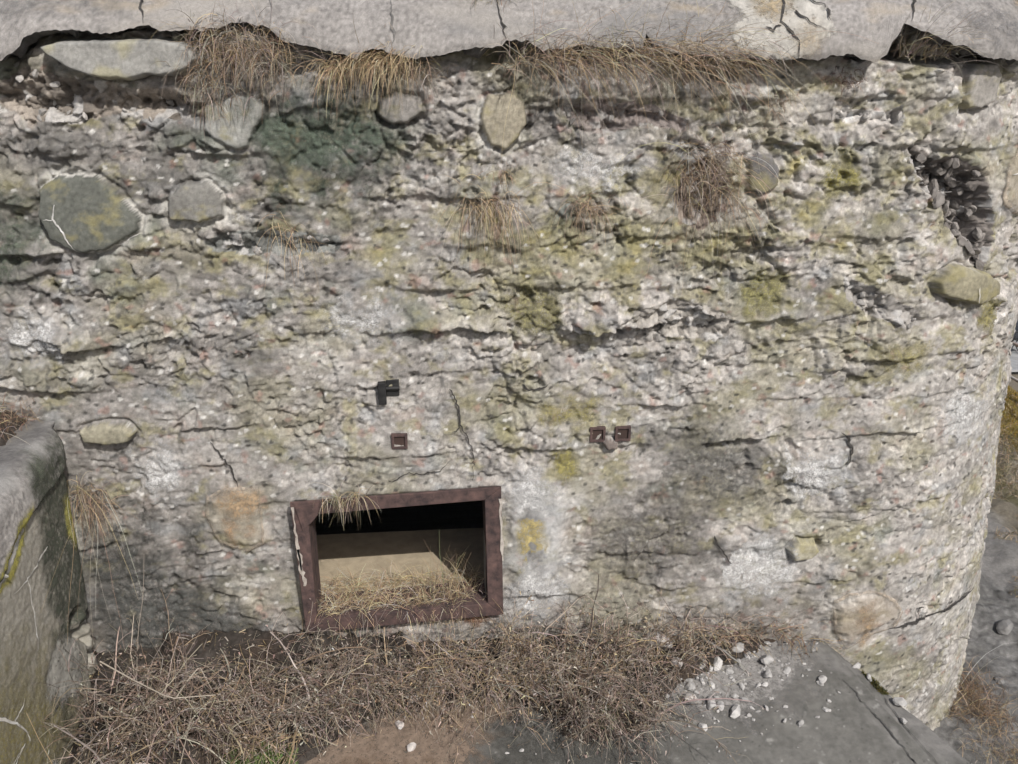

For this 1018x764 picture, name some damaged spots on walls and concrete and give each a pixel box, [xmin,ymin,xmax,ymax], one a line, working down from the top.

crack [766,0,831,58]
spalling [907,147,1018,271]
crack [0,491,49,638]
crack [889,587,974,629]
crack [0,698,71,764]